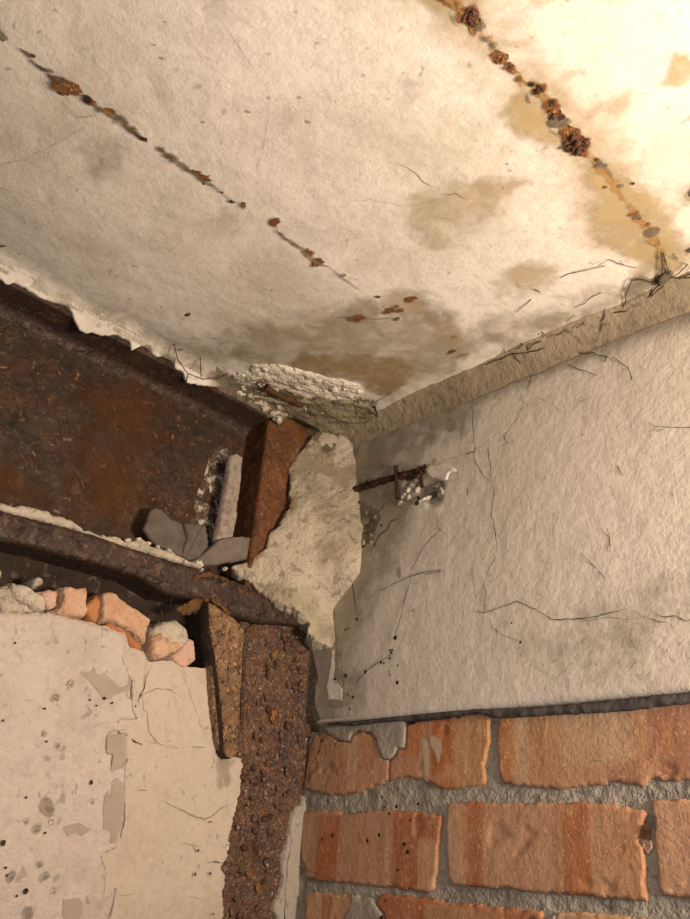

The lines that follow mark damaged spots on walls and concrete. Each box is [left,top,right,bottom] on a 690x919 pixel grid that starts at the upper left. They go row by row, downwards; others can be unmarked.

damp [668,57,690,85]
damp [508,96,559,143]
damp [587,162,682,268]
corrosion [305,248,324,268]
corrosion [382,296,418,321]
damp [294,356,412,394]
crack [451,374,689,640]
peeling [0,571,195,919]
corrosion [240,701,293,806]